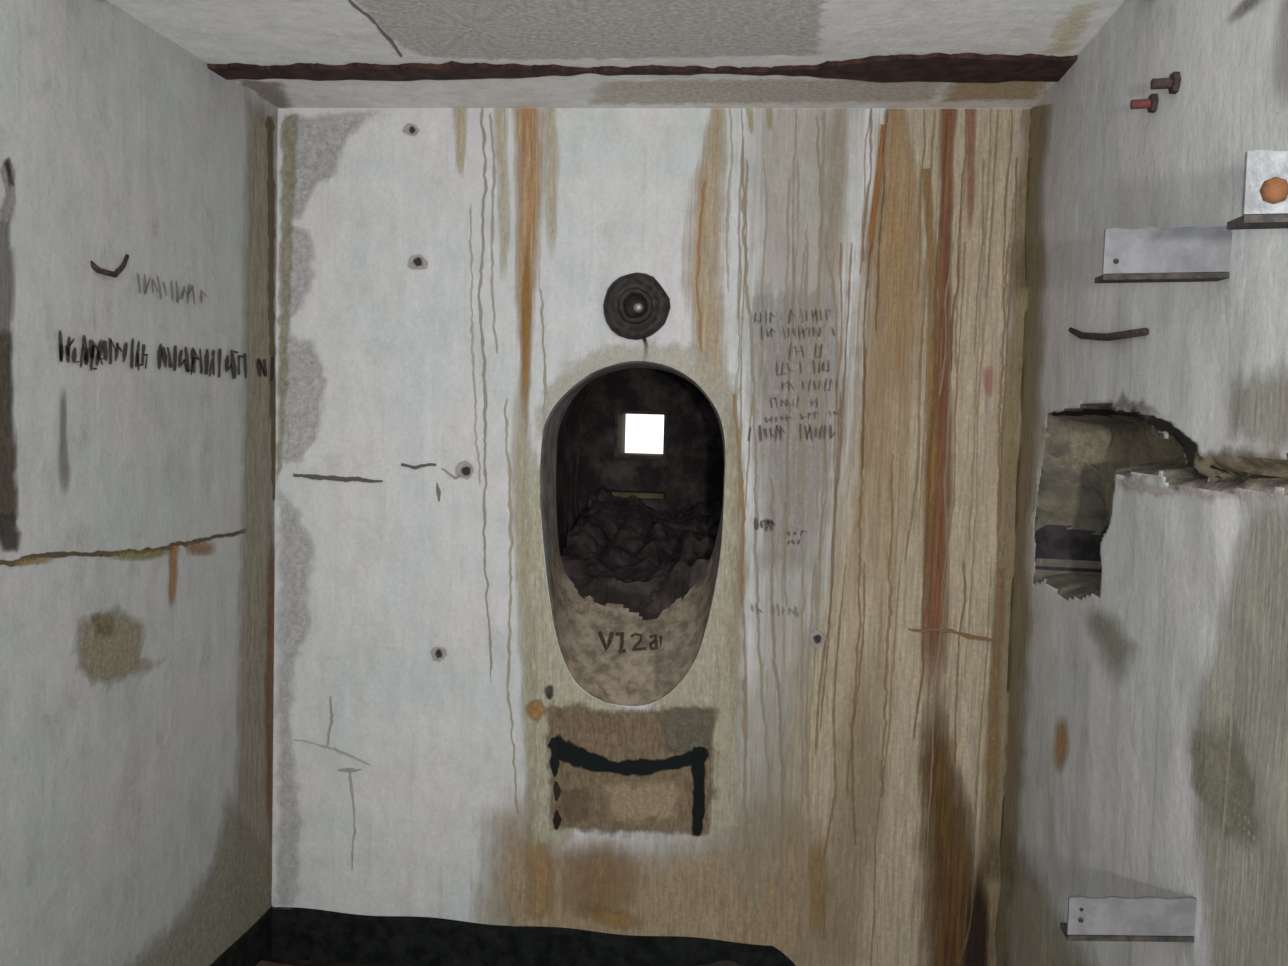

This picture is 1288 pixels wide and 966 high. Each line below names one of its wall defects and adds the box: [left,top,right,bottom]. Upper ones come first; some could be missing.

leakage [61,397,69,484]
leakage [79,612,150,682]
crack [0,529,245,601]
leakage [139,80,287,966]
peeling [279,504,312,904]
peeling [276,114,364,471]
crack [327,696,361,869]
rust [455,108,465,170]
rust [496,108,556,803]
rust [688,108,746,690]
rust [860,109,975,665]
rust [919,708,987,966]